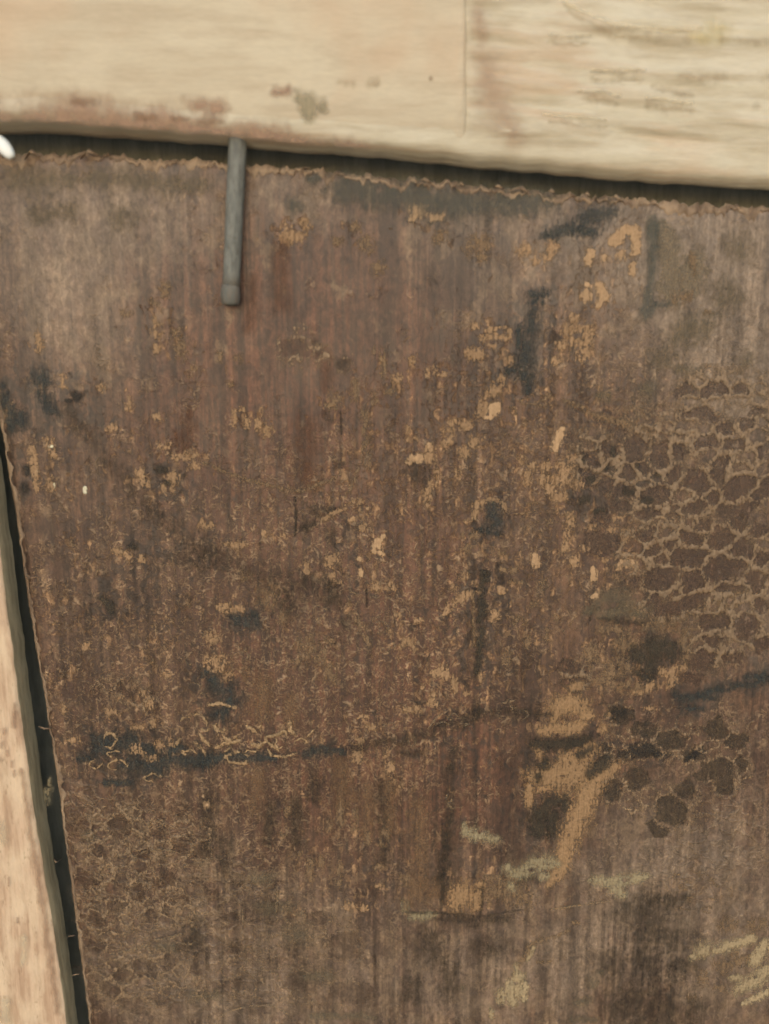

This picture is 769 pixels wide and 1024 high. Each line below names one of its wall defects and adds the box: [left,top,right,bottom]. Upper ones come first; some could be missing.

peeling [407,201,446,224]
leakage [538,204,618,239]
peeling [583,223,642,277]
peeling [464,320,513,363]
leakage [504,288,552,394]
peeling [551,280,611,366]
peeling [403,353,515,510]
peeling [521,621,697,808]
leakage [76,730,277,824]